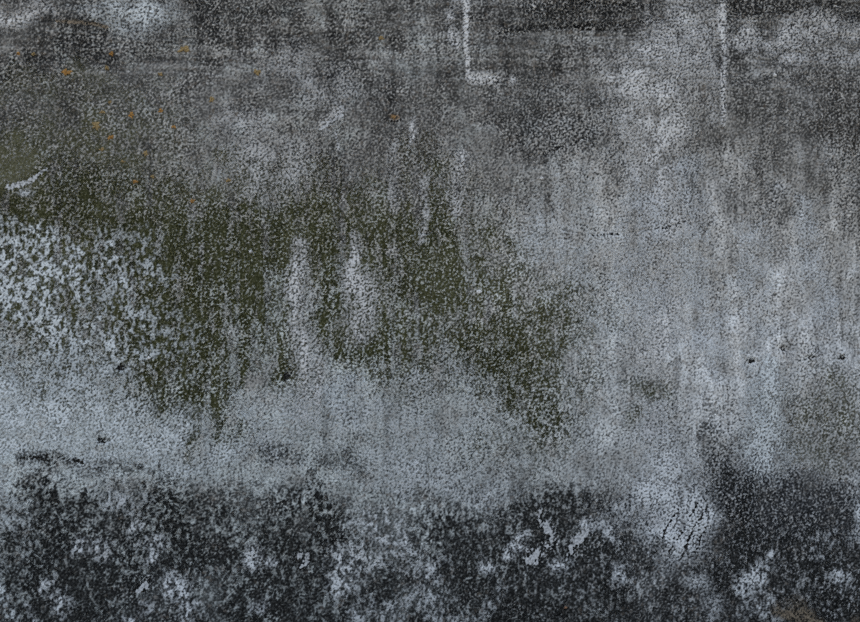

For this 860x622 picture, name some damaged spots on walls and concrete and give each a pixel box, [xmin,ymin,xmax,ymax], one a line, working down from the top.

water stain [454,150,466,178]
water stain [524,213,579,270]
water stain [0,216,398,622]
water stain [365,421,454,494]
water stain [421,485,649,622]
water stain [694,356,860,622]